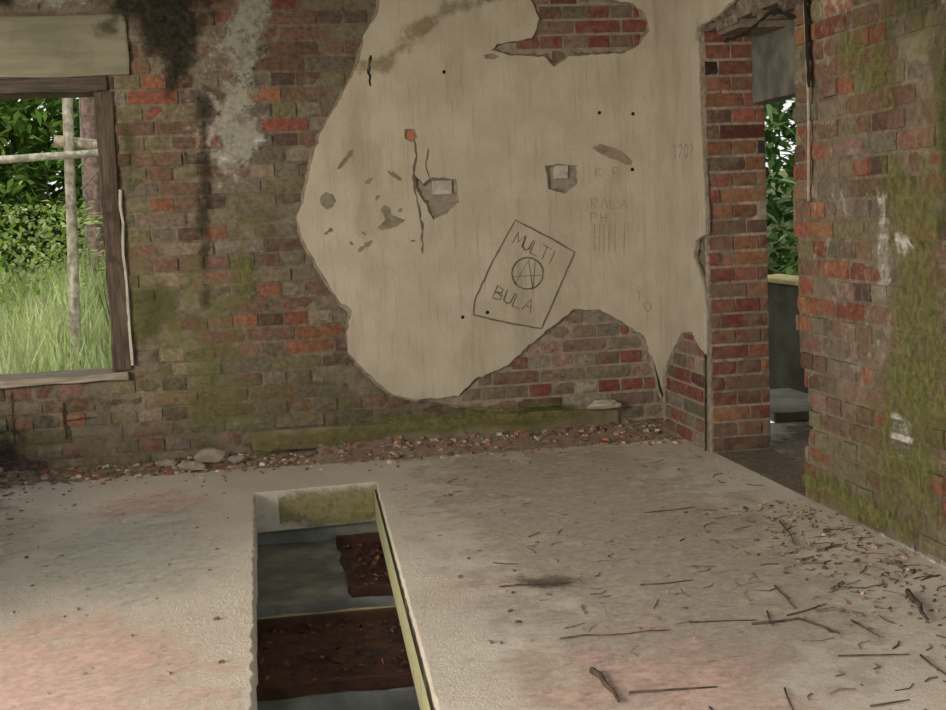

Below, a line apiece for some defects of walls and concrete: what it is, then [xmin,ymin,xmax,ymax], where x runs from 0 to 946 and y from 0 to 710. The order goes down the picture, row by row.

leakage [98,0,212,91]
spalling [492,0,648,66]
leakage [196,90,210,266]
crack [412,139,430,253]
leakage [878,193,911,280]
leakage [937,14,946,232]
peeling [418,309,710,451]
leakage [891,413,912,451]